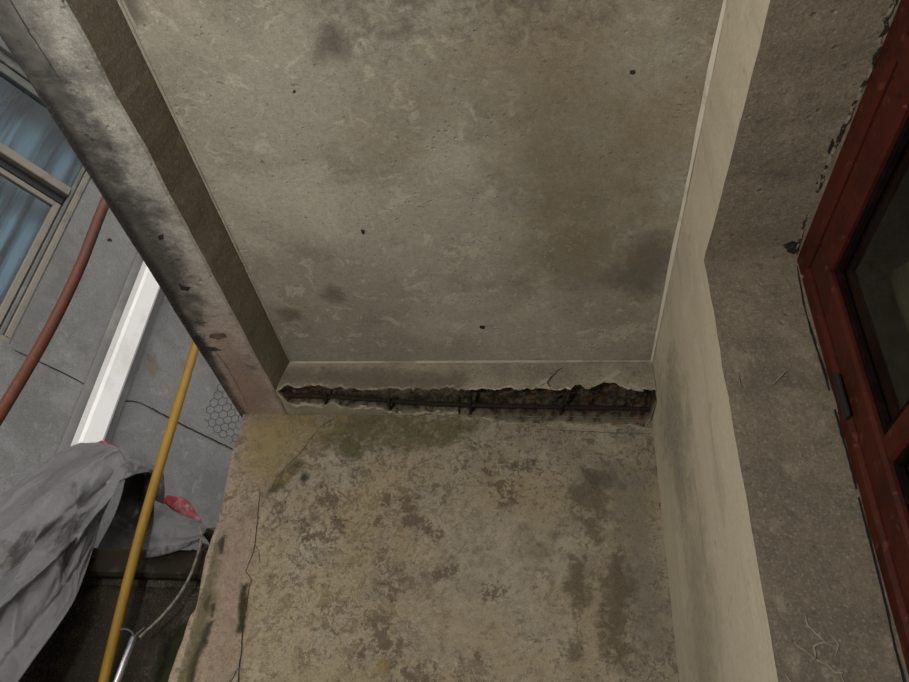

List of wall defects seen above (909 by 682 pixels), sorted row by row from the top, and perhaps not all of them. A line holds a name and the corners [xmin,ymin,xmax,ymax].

crack [15,350,84,384]
crack [125,400,233,450]
spalling [276,369,657,430]
crack [229,415,340,682]
water stain [599,555,638,663]